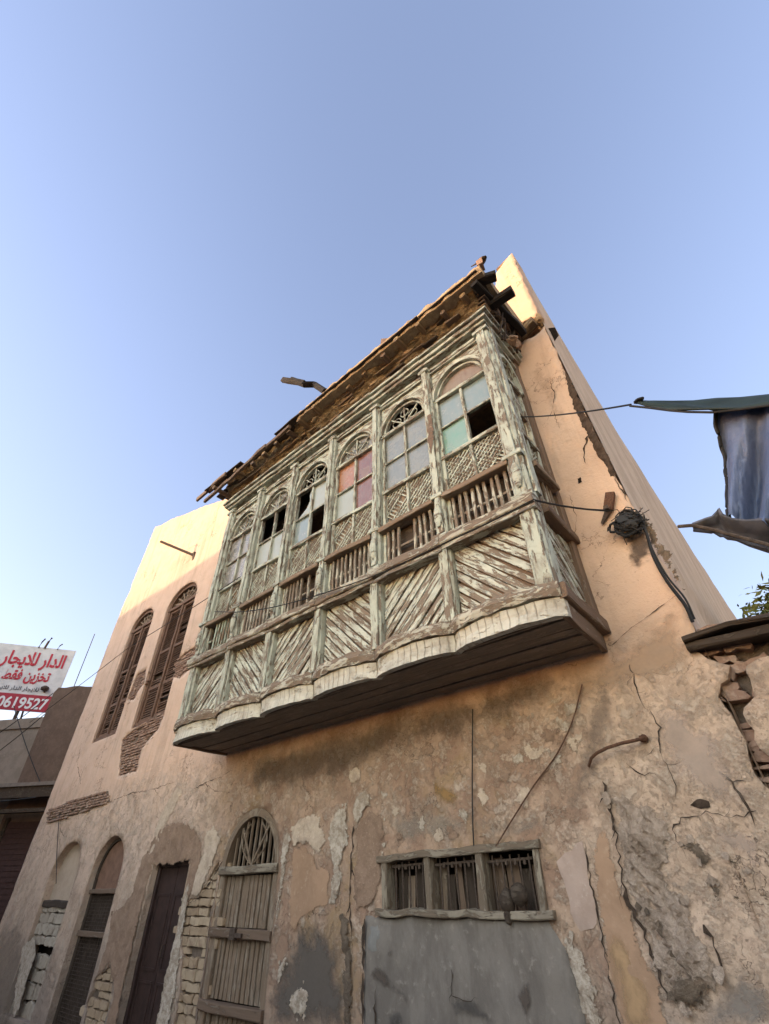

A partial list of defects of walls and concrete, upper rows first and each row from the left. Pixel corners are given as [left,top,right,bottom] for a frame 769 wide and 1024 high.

crack [548,373,628,502]
crack [627,665,755,859]
peeling [12,937,36,1019]
flaking render [79,822,233,1024]
flaking render [273,767,399,1024]
crack [585,781,668,1023]
crack [702,924,723,967]